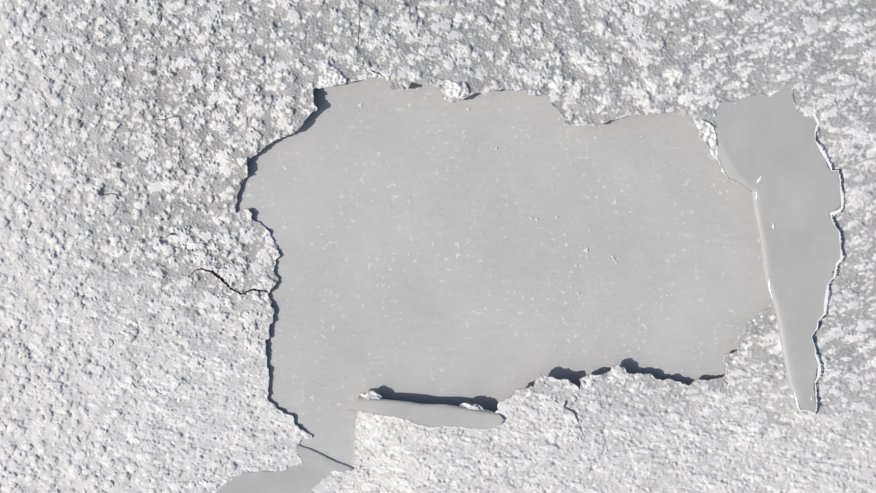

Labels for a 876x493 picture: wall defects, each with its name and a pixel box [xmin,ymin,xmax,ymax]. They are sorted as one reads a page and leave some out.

crack [190,259,268,295]
peeling [216,69,846,493]